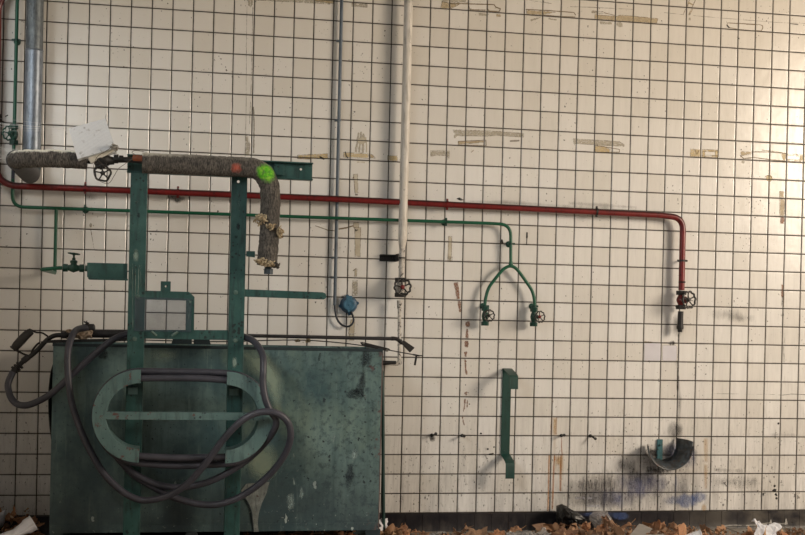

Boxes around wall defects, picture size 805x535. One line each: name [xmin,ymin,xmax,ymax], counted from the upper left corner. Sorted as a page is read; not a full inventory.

corrosion [548,438,562,509]